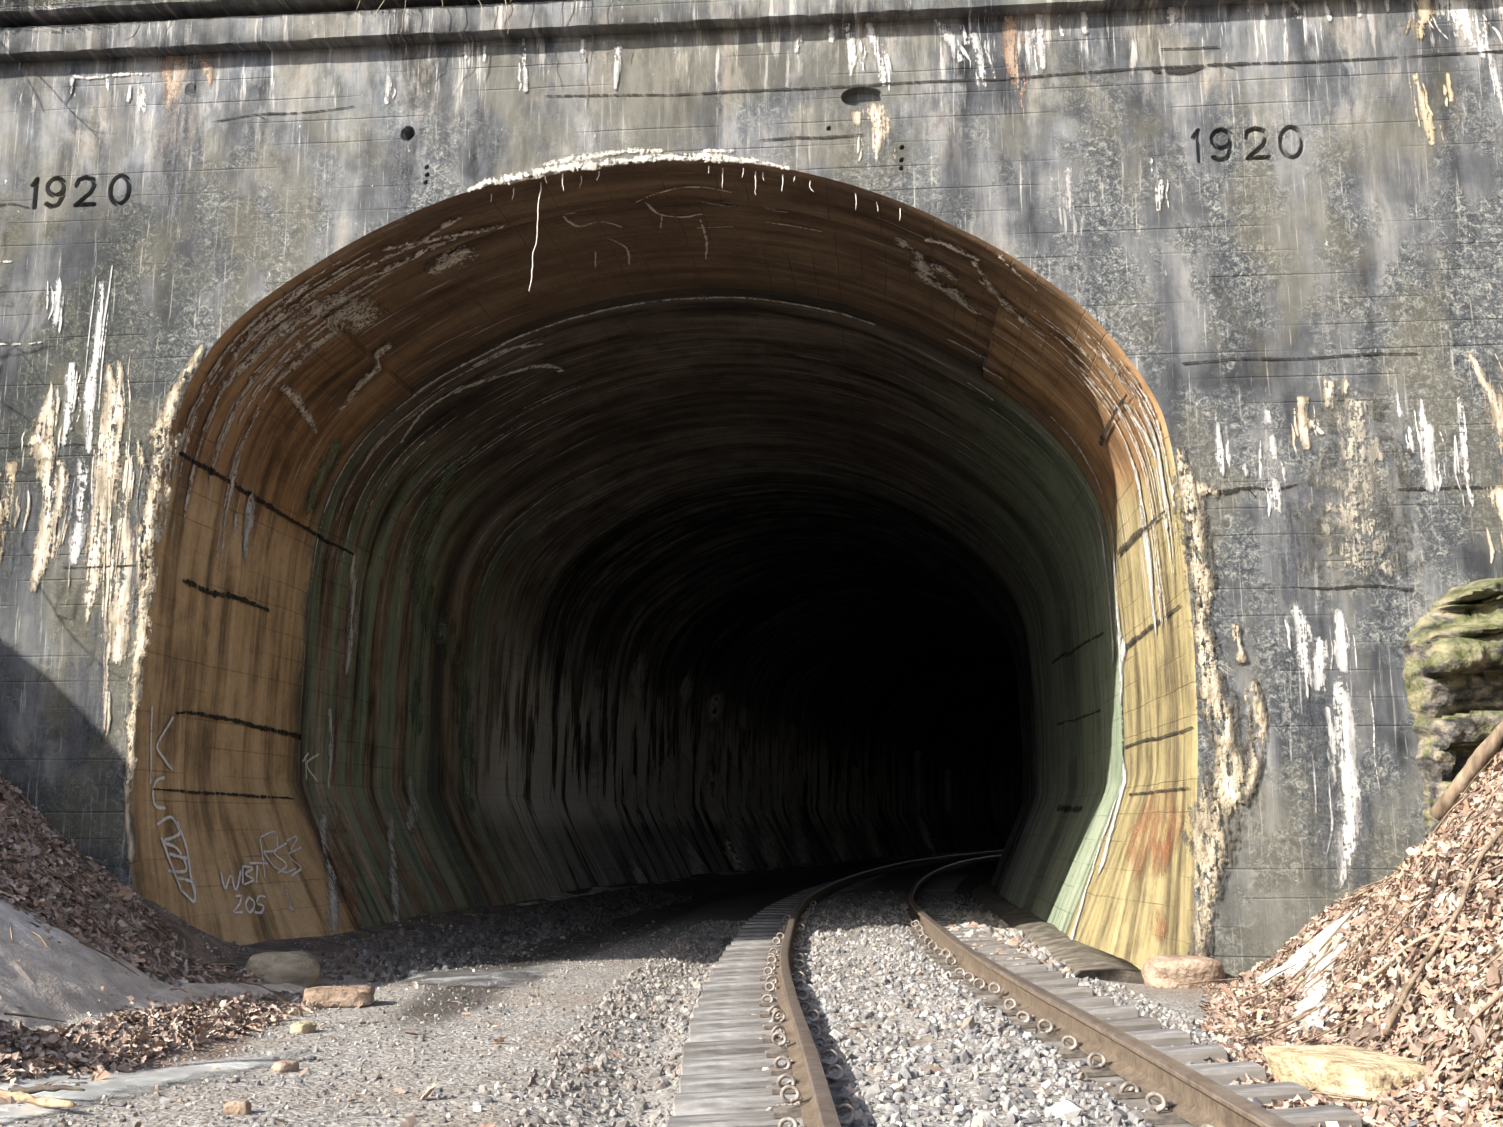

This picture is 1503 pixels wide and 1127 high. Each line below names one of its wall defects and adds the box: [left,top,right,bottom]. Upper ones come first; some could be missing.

water stain [1165,7,1182,26]
water stain [1320,0,1332,21]
water stain [69,72,148,113]
water stain [154,63,199,223]
water stain [467,147,790,193]
water stain [1409,72,1454,146]
water stain [1405,0,1503,115]
corrosion [1126,786,1182,878]